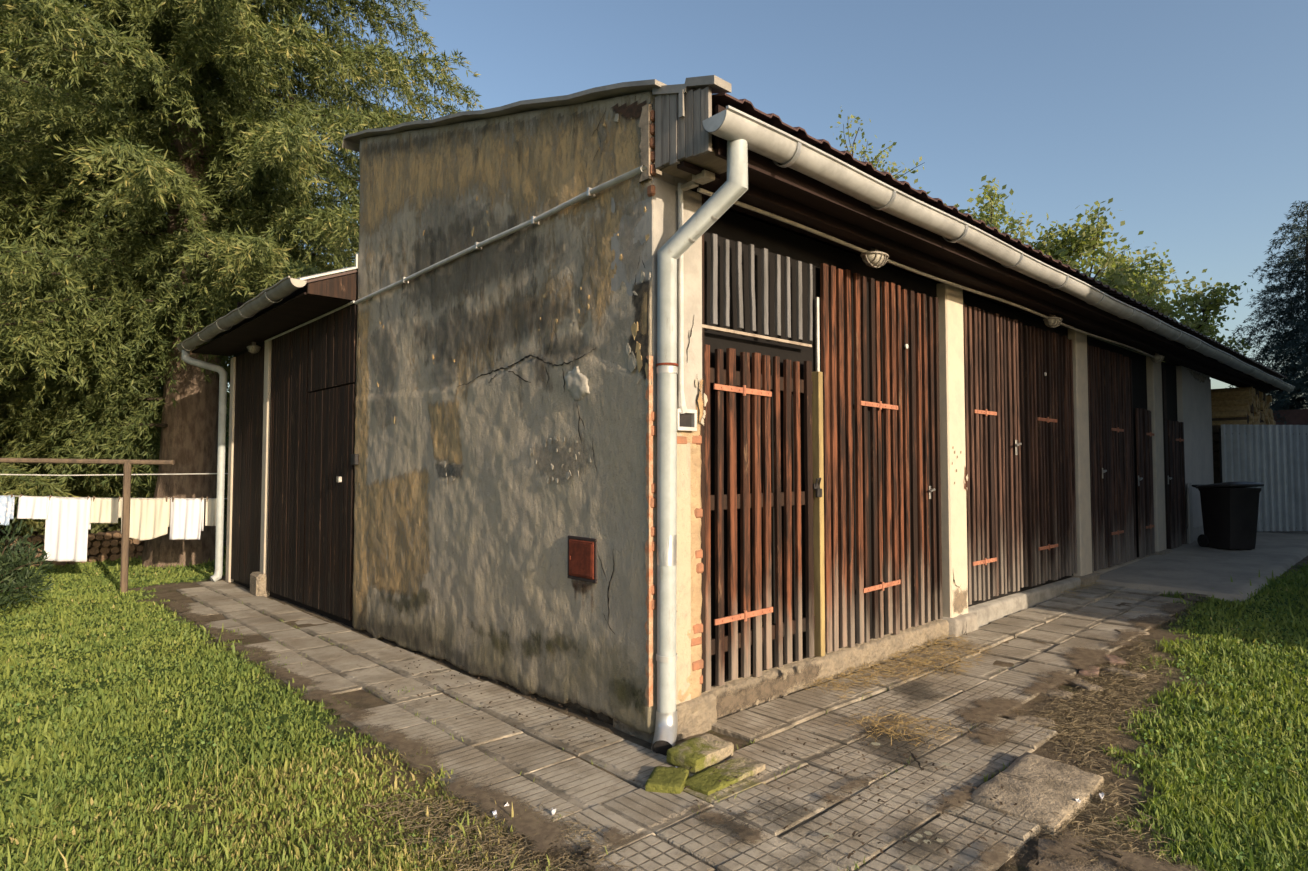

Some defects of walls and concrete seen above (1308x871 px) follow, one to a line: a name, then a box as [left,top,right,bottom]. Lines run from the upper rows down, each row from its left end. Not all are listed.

spalling [435,461,462,483]
crack [458,307,598,475]
spalling [626,270,656,707]